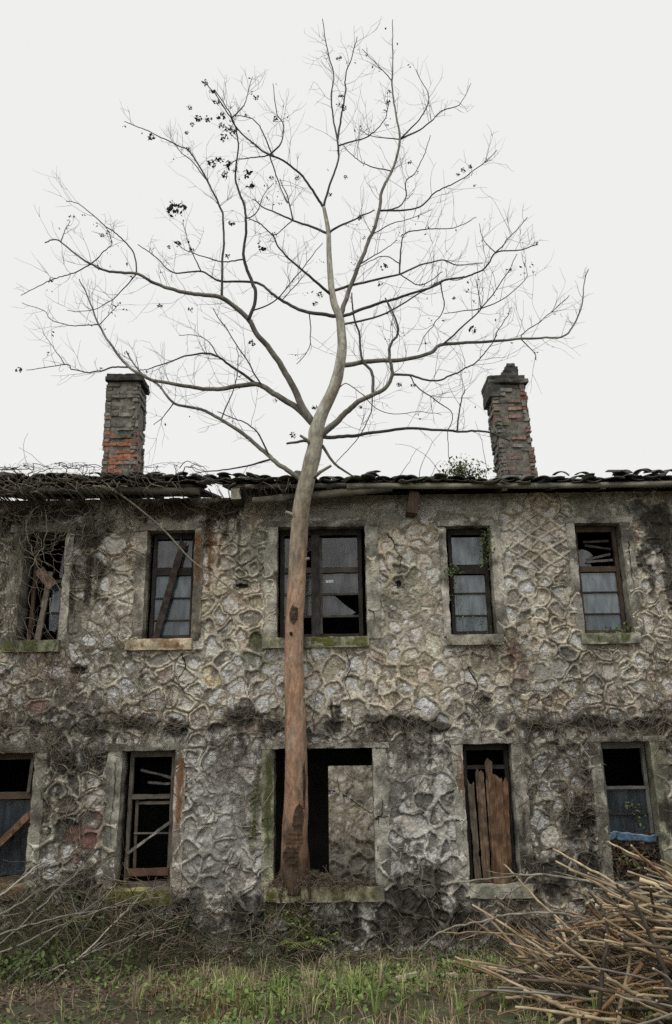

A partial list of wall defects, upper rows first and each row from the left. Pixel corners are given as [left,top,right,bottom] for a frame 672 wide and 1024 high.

damp [626,500,672,609]
damp [208,706,282,757]
damp [323,702,343,734]
rust [175,757,183,829]
damp [228,894,269,948]
damp [307,859,485,947]